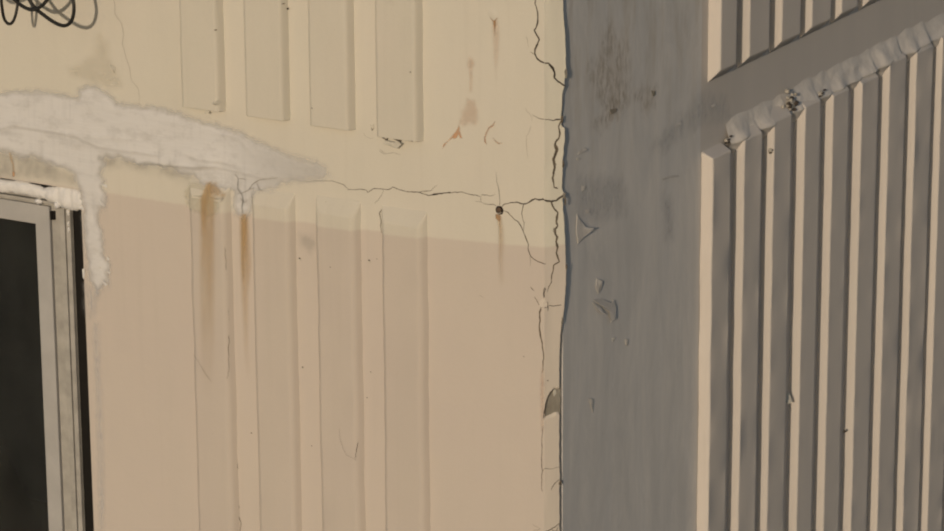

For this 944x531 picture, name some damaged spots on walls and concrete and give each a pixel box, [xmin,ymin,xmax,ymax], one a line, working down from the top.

crack [526,0,565,86]
crack [307,115,566,372]
spalling [543,388,561,417]